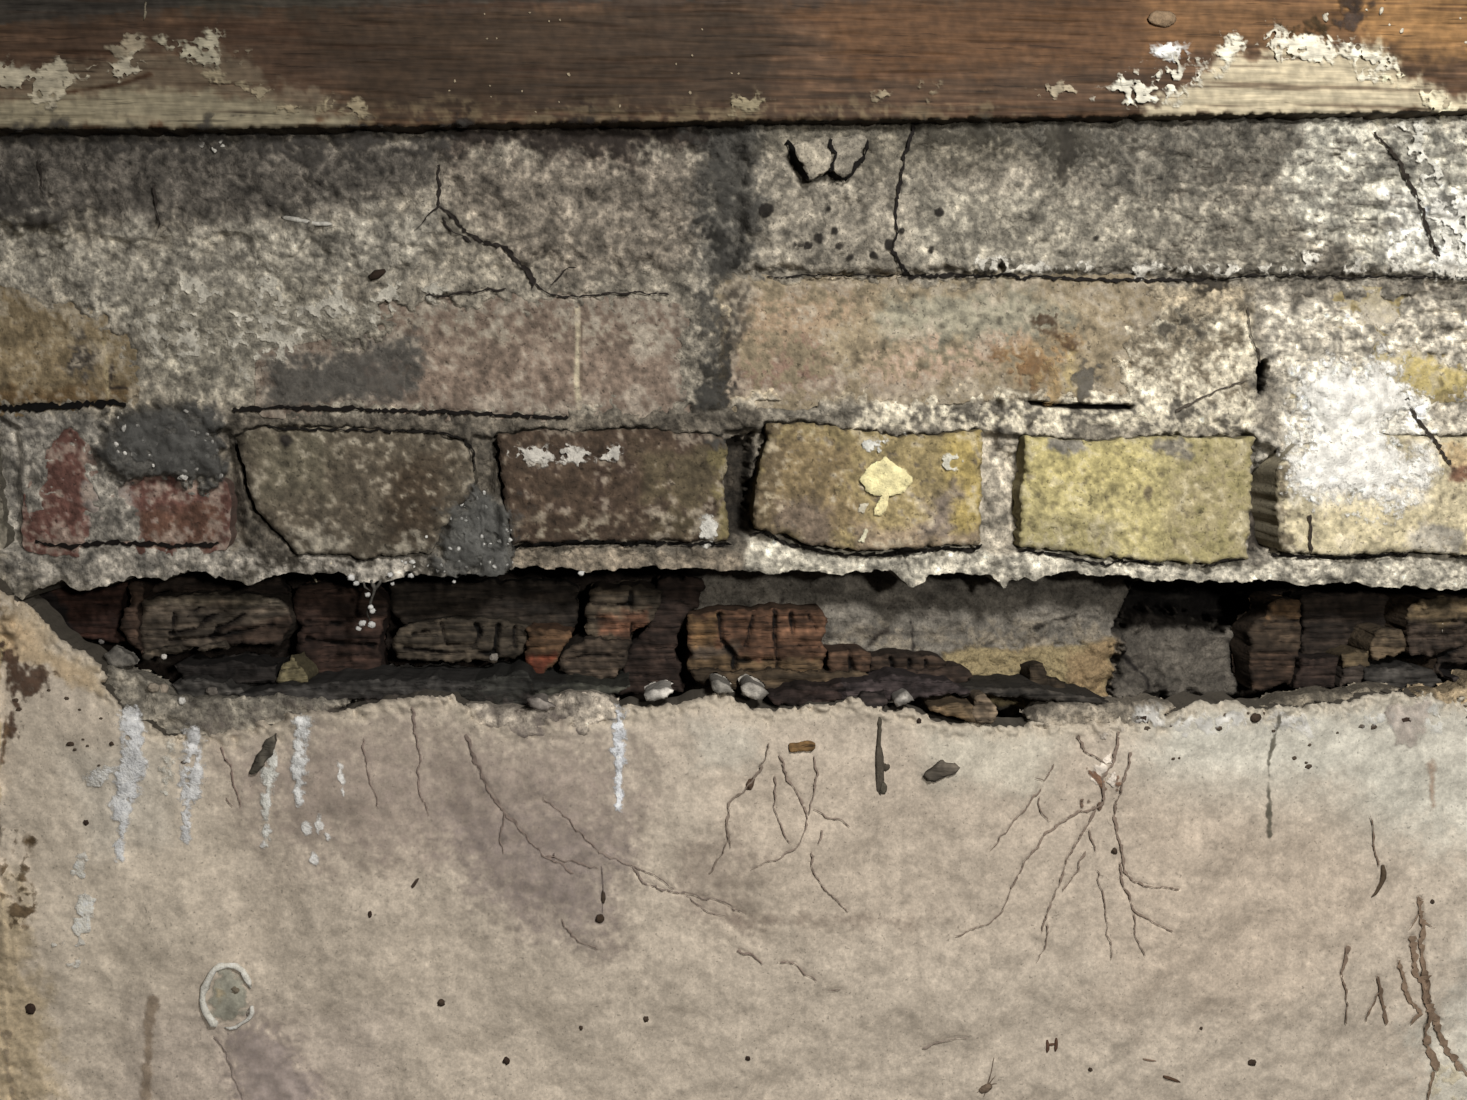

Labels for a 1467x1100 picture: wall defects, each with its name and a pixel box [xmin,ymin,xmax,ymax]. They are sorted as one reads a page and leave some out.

crack [414,165,669,299]
crack [767,124,1467,412]
water stain [85,705,207,863]
flaking render [103,644,357,738]
water stain [260,715,331,865]
water stain [337,763,345,796]
flaking render [466,689,620,738]
water stain [610,705,628,811]
crack [465,734,850,991]
spalling [644,680,674,701]
crack [958,731,1179,960]
flaking render [1019,693,1176,731]